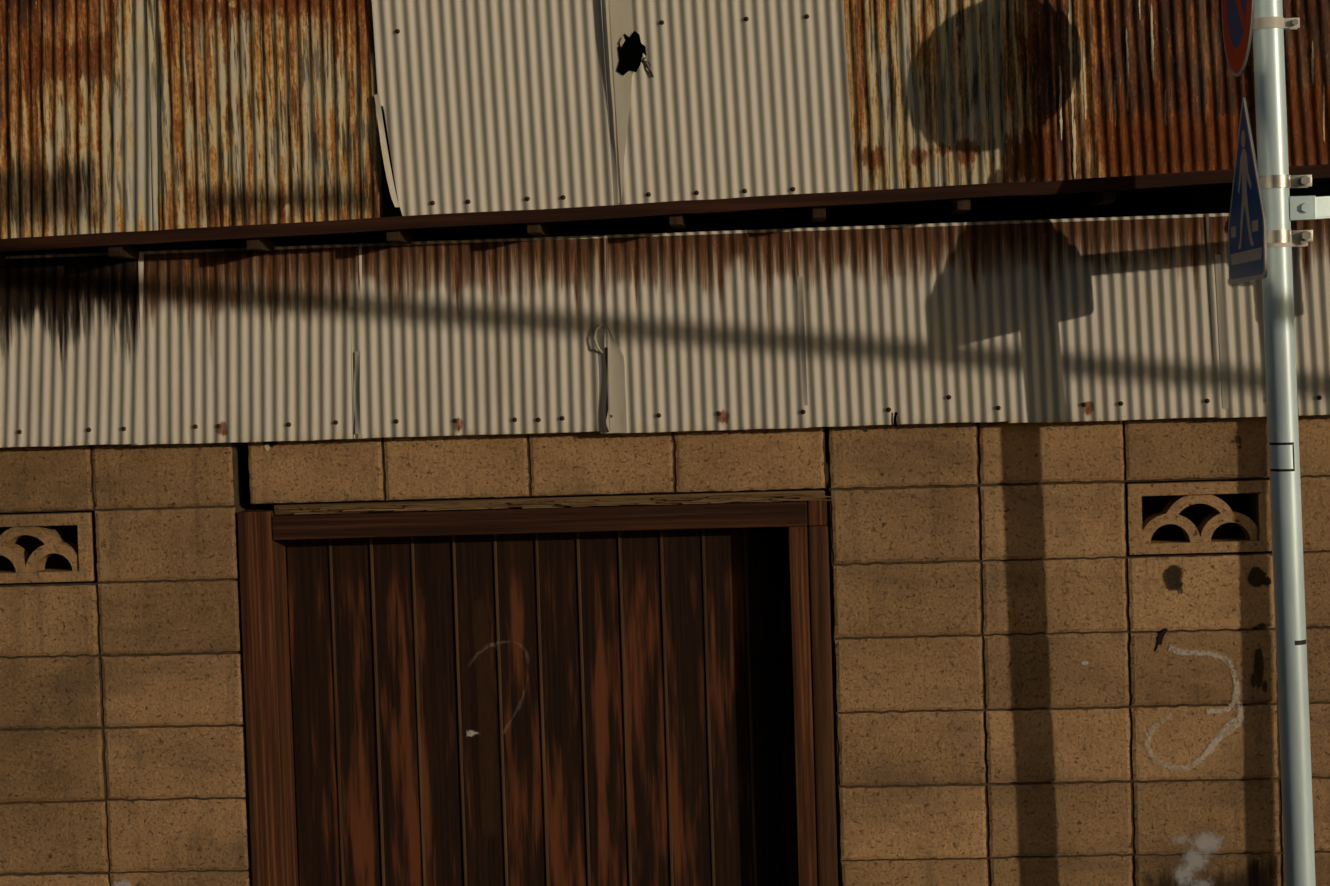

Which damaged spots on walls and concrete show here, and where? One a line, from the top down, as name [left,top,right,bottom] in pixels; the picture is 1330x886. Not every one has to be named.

corrosion [20,27,118,125]
corrosion [171,0,365,115]
corrosion [911,138,980,183]
corrosion [1004,128,1057,183]
corrosion [1091,77,1257,177]
corrosion [1286,56,1330,166]